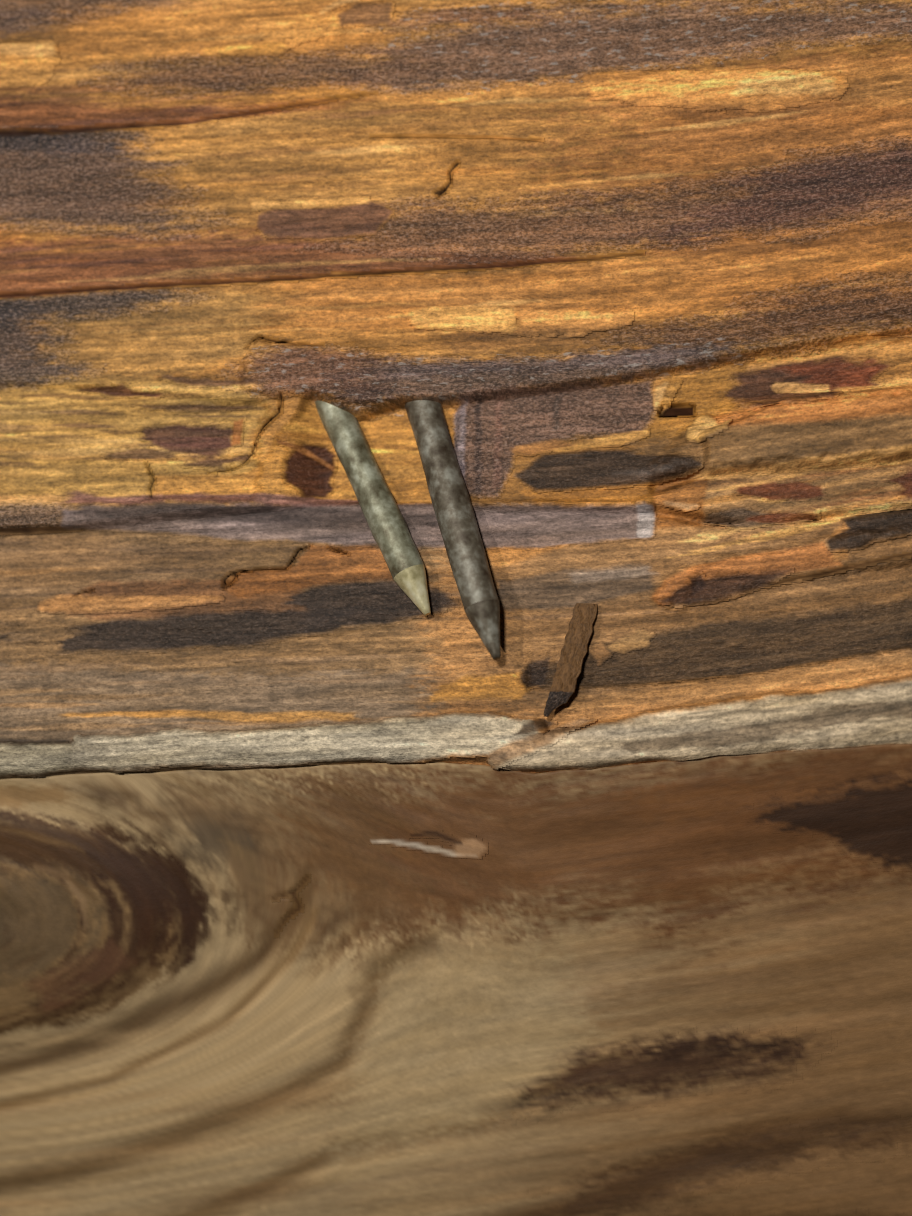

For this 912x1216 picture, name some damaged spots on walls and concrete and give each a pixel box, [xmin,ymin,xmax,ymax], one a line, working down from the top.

crack [369,133,545,200]
crack [207,391,283,475]
crack [220,542,350,591]